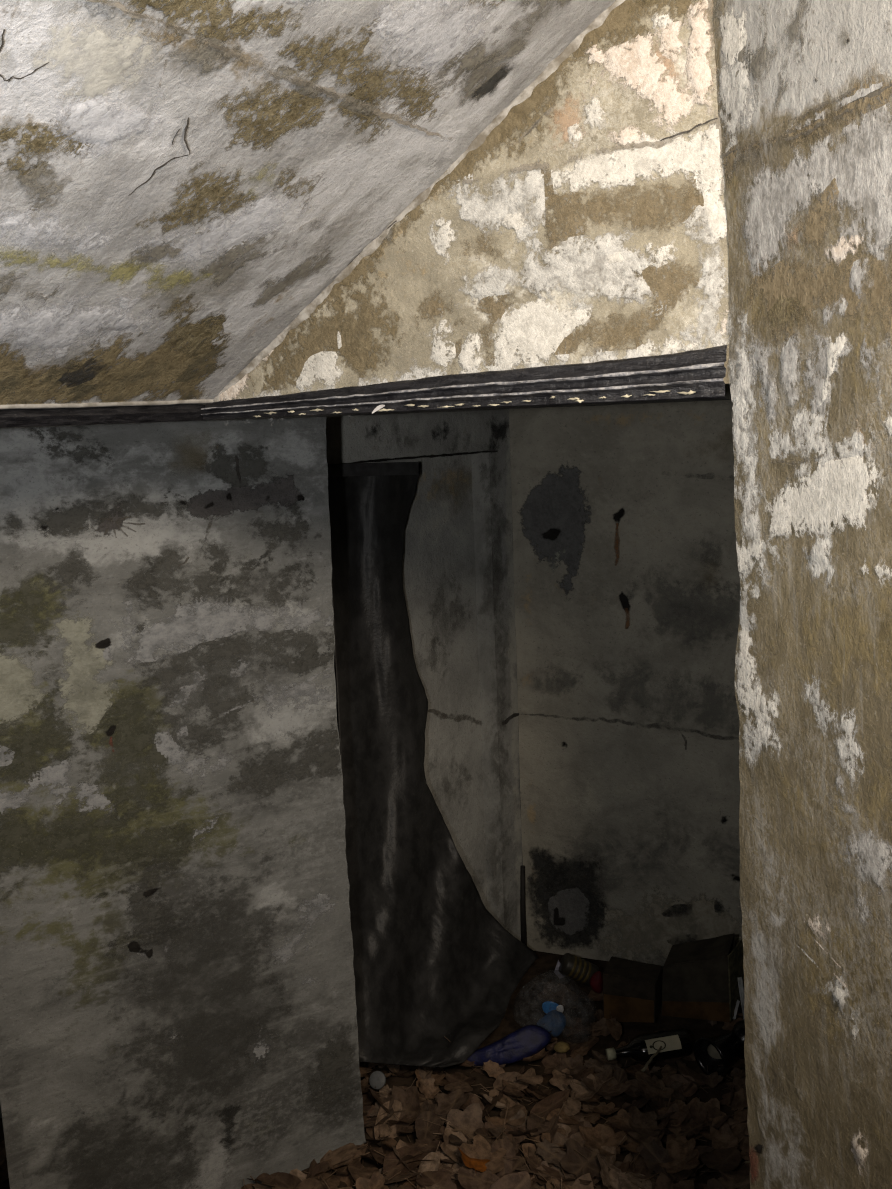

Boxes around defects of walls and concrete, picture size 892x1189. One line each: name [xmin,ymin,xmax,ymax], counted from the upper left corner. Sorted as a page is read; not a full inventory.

crack [0,29,49,82]
crack [86,0,452,139]
crack [128,117,190,196]
water stain [251,0,704,398]
water stain [2,235,284,290]
peeling [0,297,152,358]
peeling [294,331,343,390]
peeling [429,0,892,765]
water stain [127,502,321,608]
corrosion [613,508,625,566]
corrosion [619,593,630,629]
water stain [0,629,341,902]